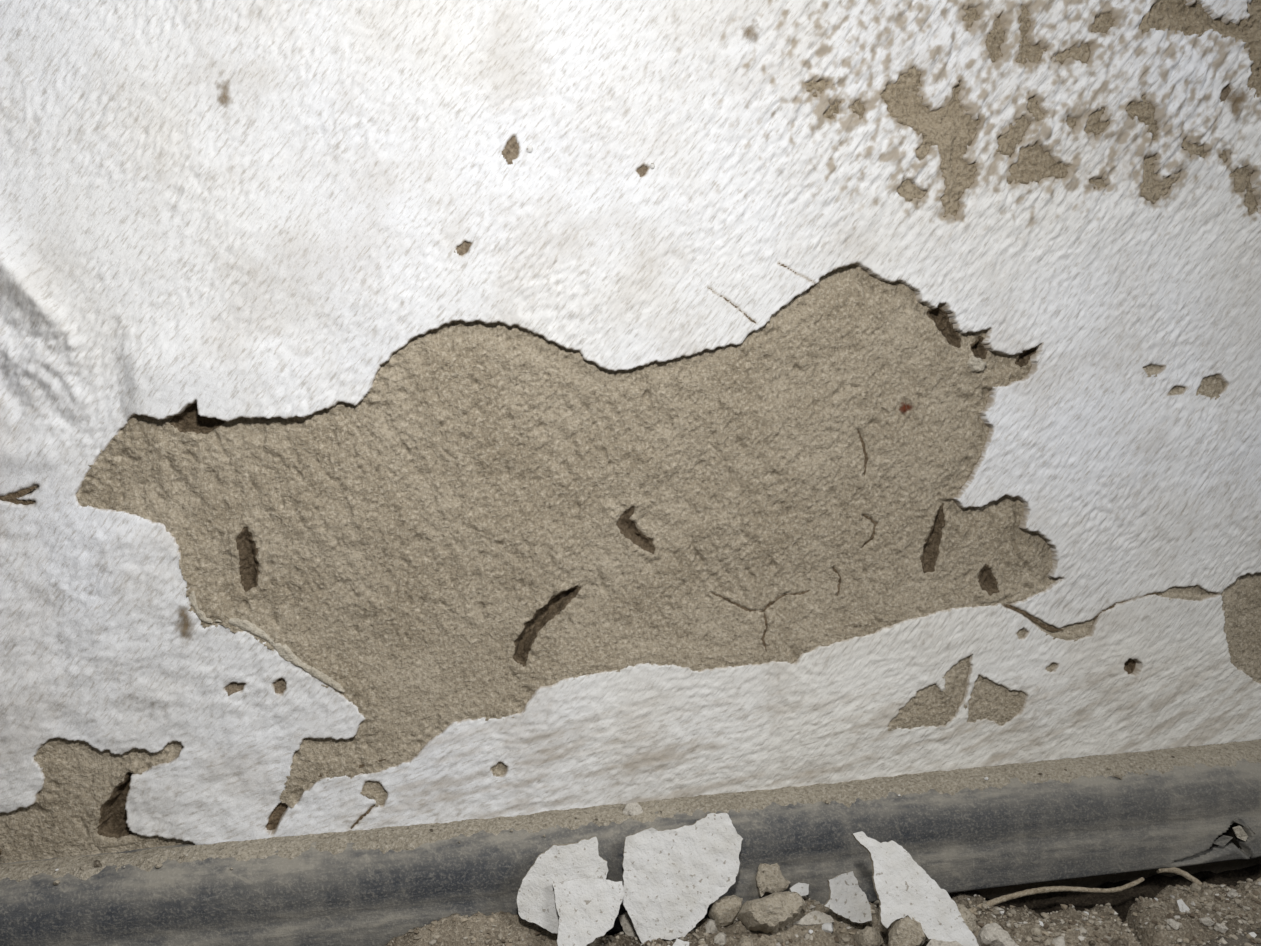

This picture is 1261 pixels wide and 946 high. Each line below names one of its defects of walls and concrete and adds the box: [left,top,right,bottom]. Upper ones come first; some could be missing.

peeling [963,5,1115,65]
flaking render [1139,0,1261,98]
peeling [880,67,981,217]
peeling [996,97,1069,184]
peeling [1126,95,1158,140]
peeling [1140,155,1181,204]
peeling [1181,138,1258,215]
peeling [1168,374,1227,400]
crack [0,486,37,505]
flaking render [76,264,1096,808]
flaking render [1157,572,1261,683]
flaking render [0,738,195,864]